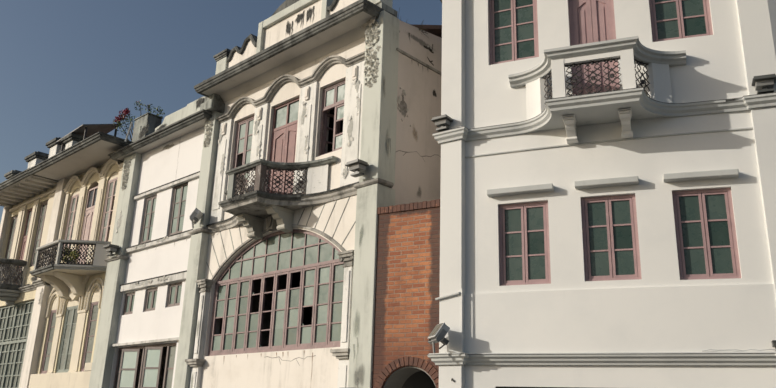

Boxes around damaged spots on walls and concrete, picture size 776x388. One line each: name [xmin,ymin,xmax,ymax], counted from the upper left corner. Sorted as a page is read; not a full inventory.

flaking render [397,88,411,126]